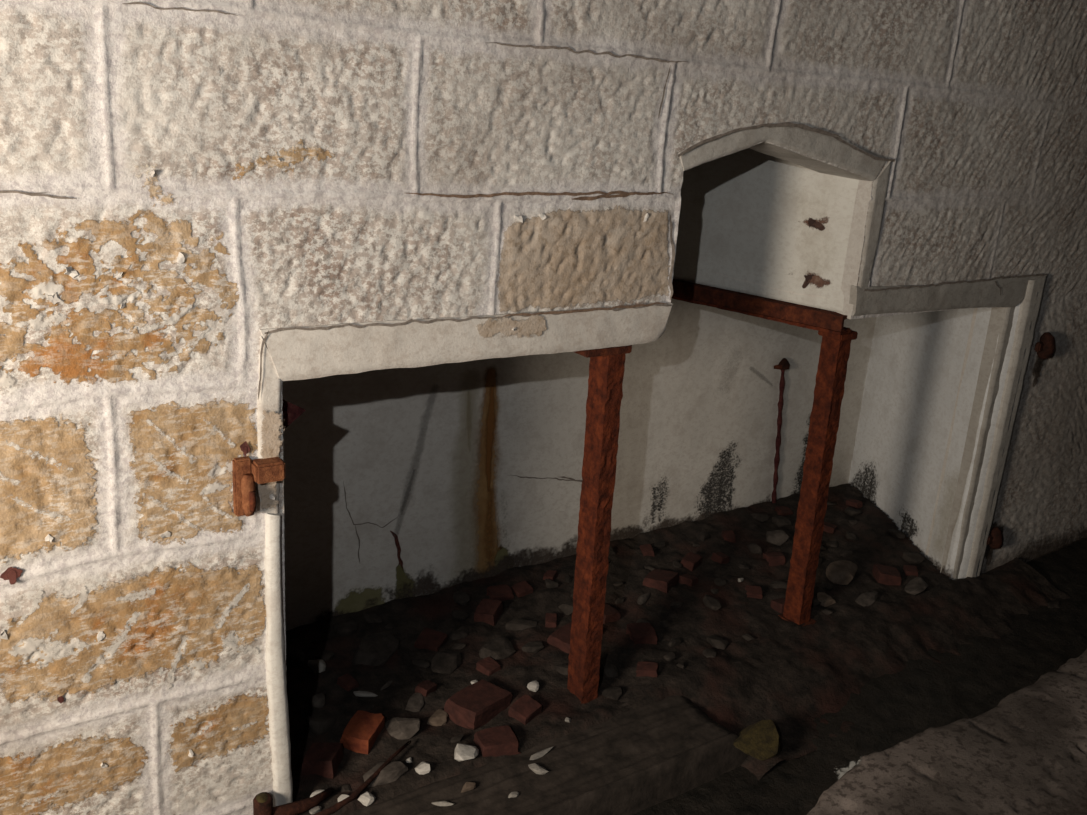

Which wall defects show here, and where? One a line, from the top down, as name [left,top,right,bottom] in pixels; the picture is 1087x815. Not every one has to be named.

peeling [0,157,239,389]
peeling [477,205,670,338]
peeling [0,414,100,563]
peeling [0,562,266,703]
peeling [126,398,283,546]
crack [343,481,404,570]
damp [385,538,577,599]
rust [474,368,499,573]
damp [610,443,740,541]
peeling [0,734,148,815]
peeling [169,693,270,772]